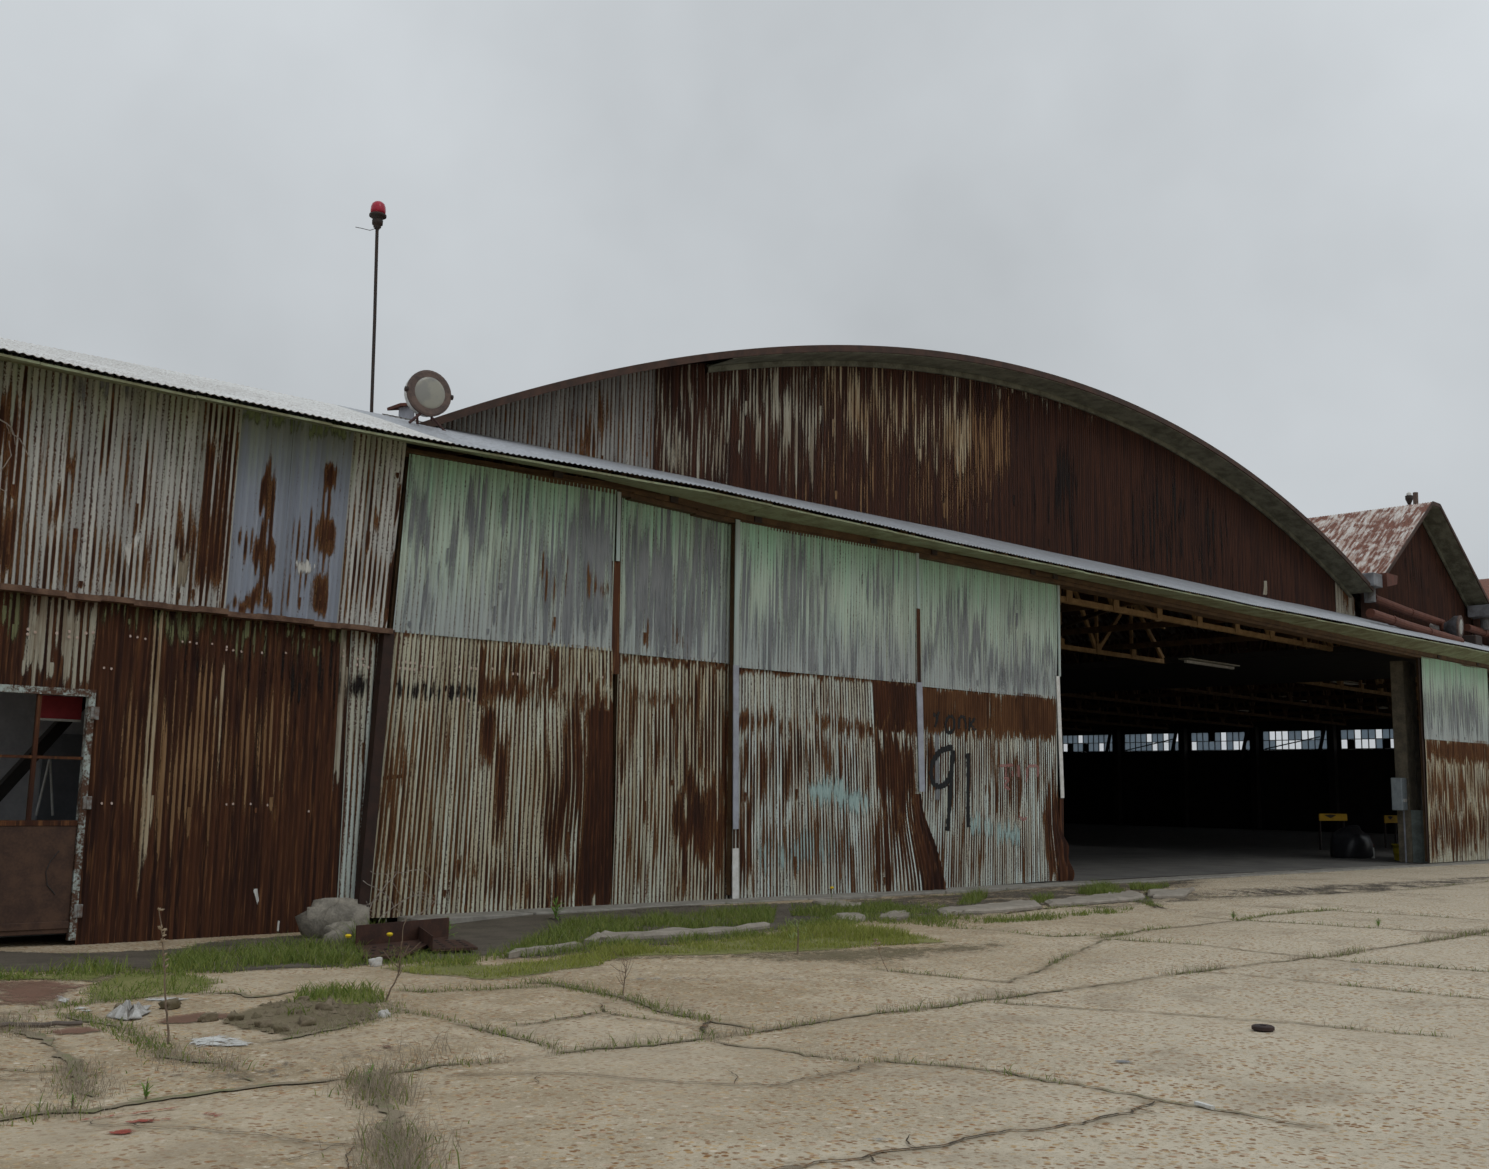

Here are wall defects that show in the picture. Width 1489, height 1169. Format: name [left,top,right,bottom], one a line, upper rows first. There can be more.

rust [0,366,1059,918]
rust [1426,738,1489,863]
crack [508,1004,712,1032]
crack [90,1119,354,1168]
crack [771,1101,1164,1169]